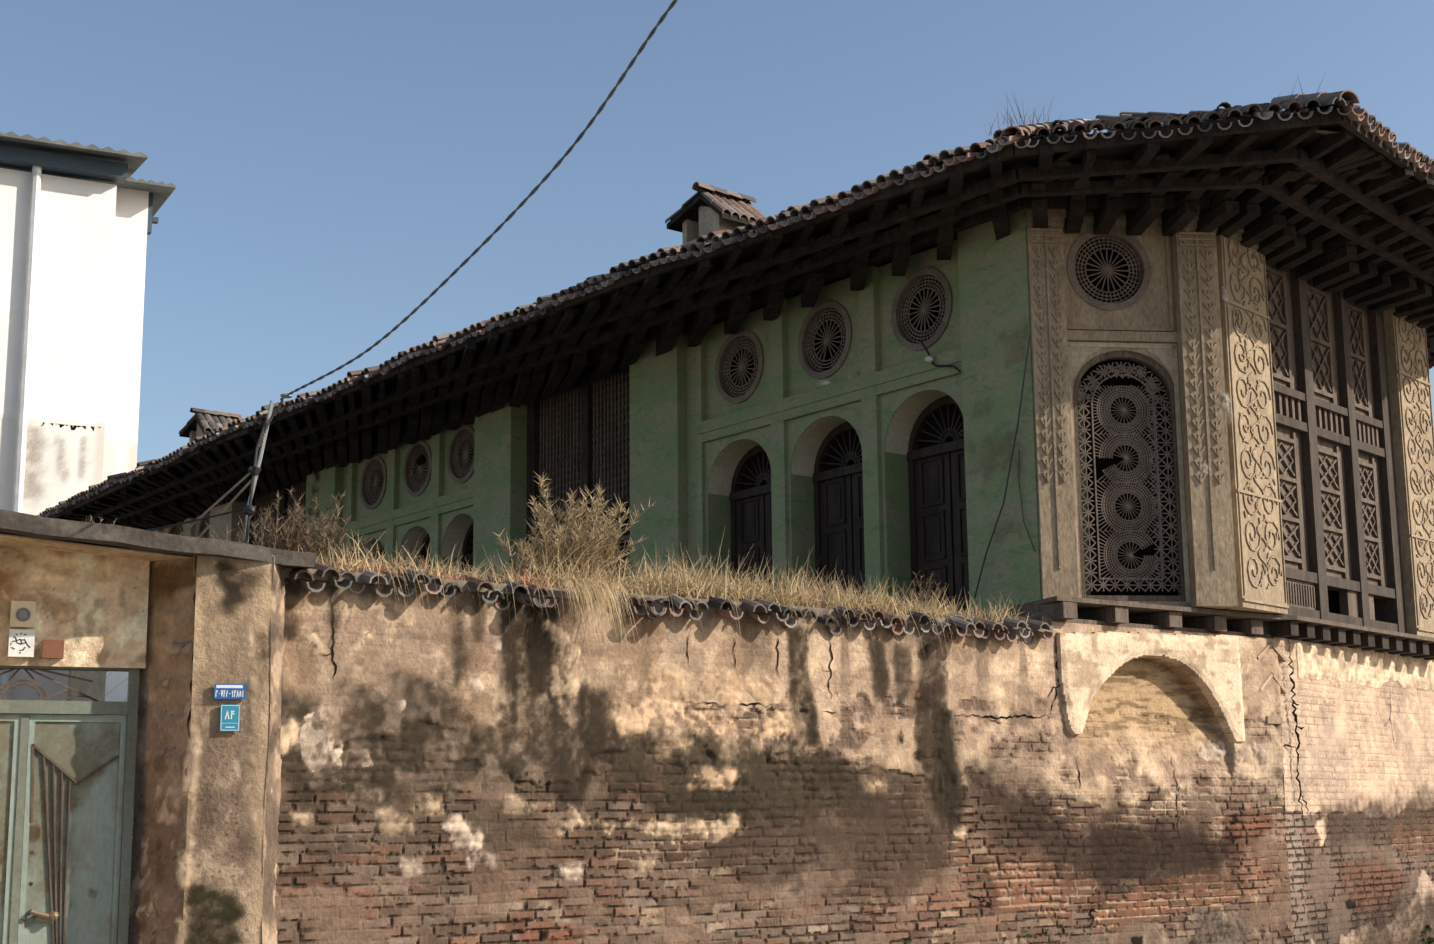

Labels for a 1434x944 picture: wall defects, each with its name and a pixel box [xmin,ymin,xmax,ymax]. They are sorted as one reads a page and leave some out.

damp [284,579,299,639]
damp [280,589,966,900]
flaking render [614,668,796,753]
crack [1284,639,1309,816]
flaking render [694,768,736,787]
flaking render [375,807,413,833]
flaking render [425,793,495,868]
flaking render [603,813,739,843]
damp [1323,789,1434,846]
flaking render [560,863,582,879]
spalling [982,854,1250,944]
damp [1355,893,1434,944]